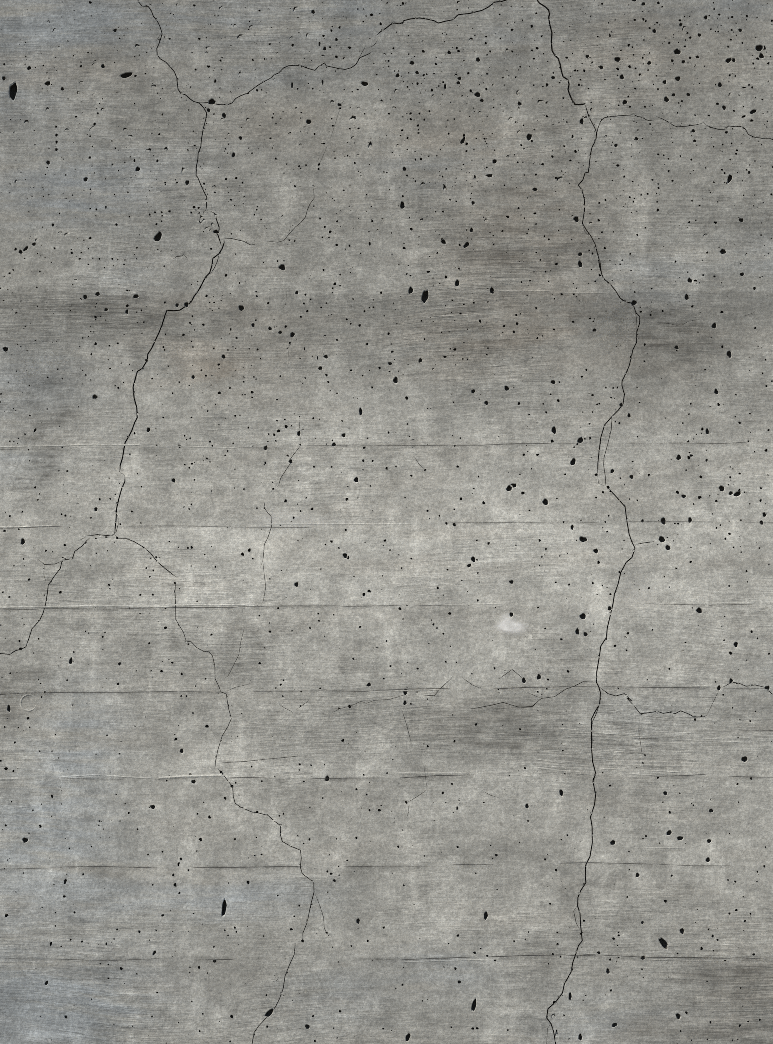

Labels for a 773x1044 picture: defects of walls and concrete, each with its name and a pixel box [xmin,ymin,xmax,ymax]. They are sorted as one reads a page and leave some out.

crack [0,0,507,1044]
crack [334,0,773,1044]